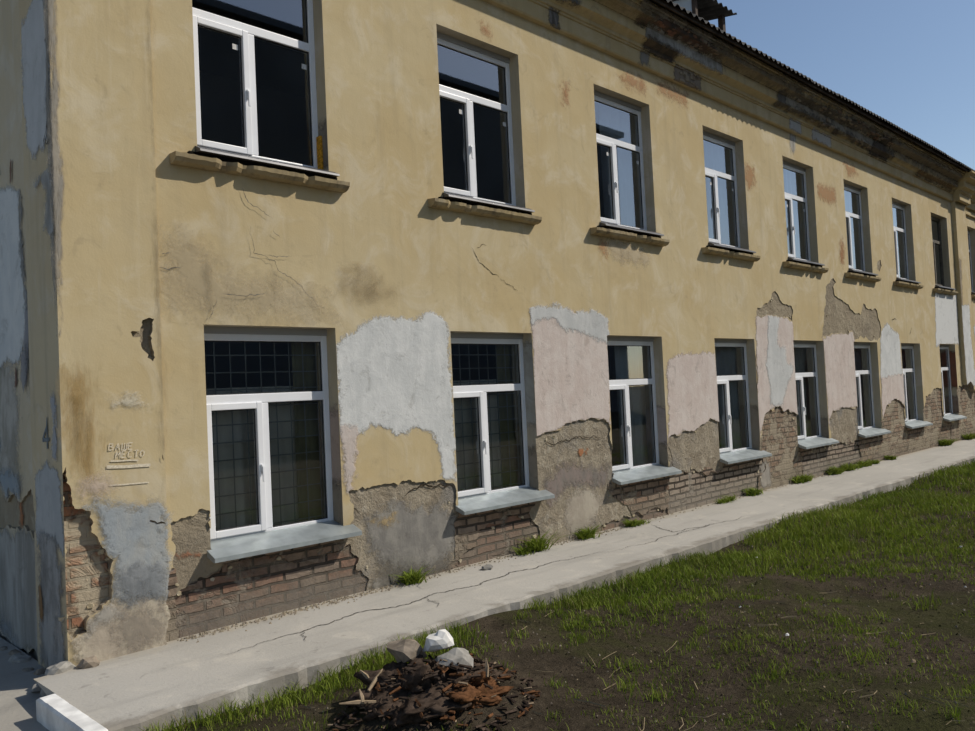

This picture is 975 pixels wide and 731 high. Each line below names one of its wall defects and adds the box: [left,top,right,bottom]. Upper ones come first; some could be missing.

peeling [21,0,64,296]
peeling [18,193,28,310]
peeling [756,291,793,321]
peeling [821,278,881,341]
flaking render [58,468,113,639]
flaking render [165,351,975,642]